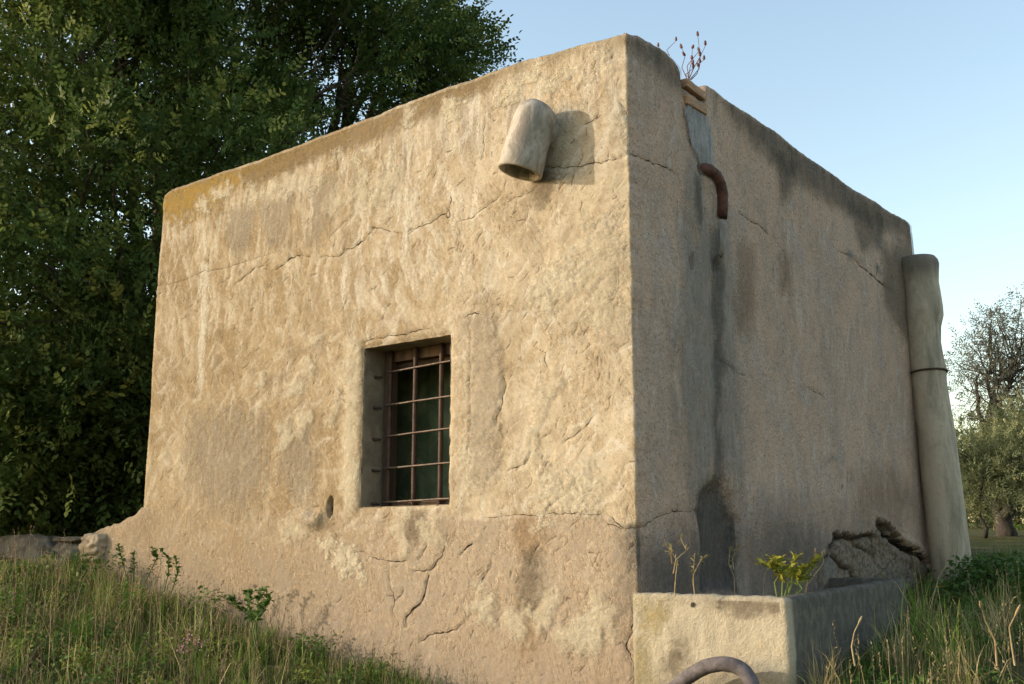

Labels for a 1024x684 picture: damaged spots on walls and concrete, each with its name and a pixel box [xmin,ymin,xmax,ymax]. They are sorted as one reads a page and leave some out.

crack [545,153,672,171]
crack [488,503,693,529]
crack [354,538,472,641]
spalling [817,523,931,590]